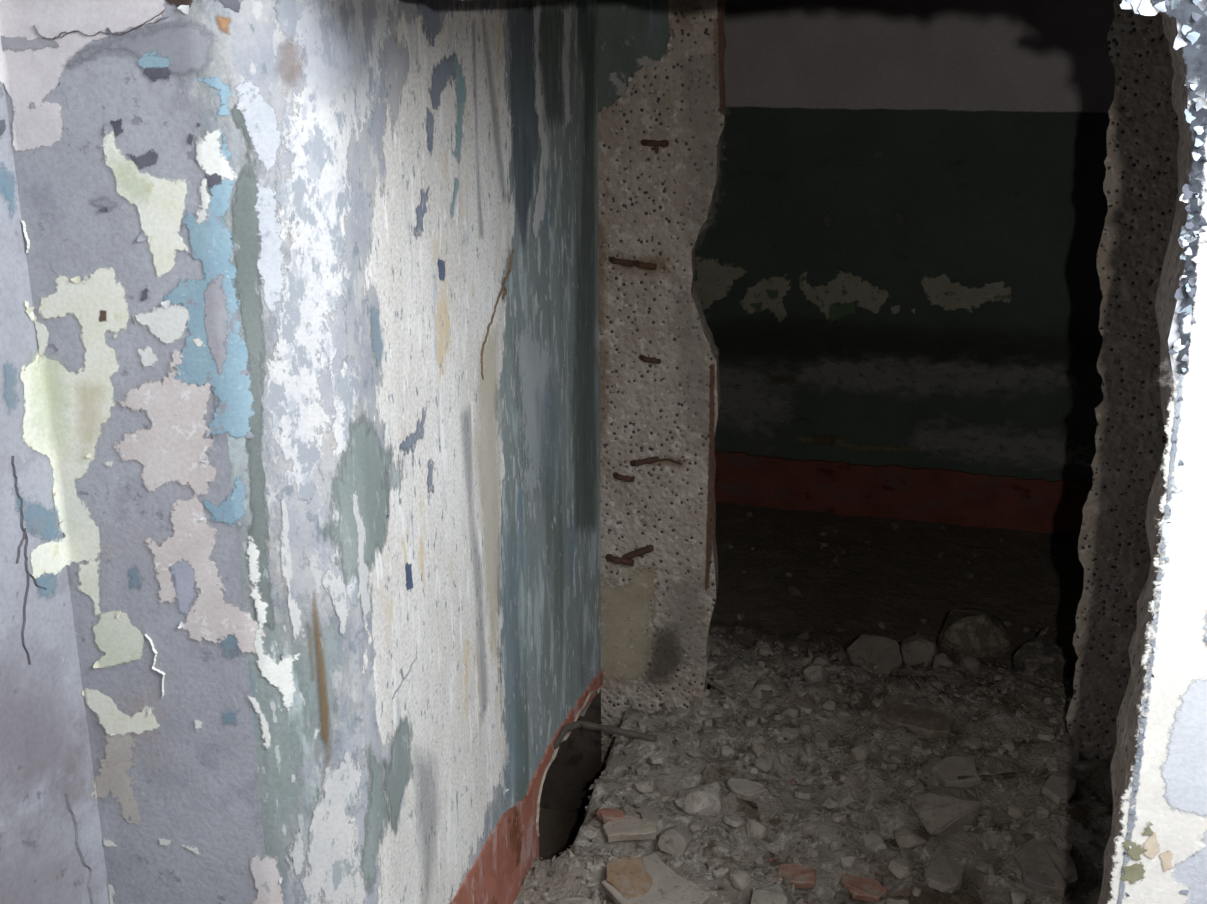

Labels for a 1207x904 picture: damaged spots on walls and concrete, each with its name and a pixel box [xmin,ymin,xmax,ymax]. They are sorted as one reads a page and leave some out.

peeling [597,0,674,113]
spalling [641,139,669,154]
crack [480,250,514,380]
spalling [609,257,657,270]
spalling [639,355,661,364]
peeling [694,256,915,323]
peeling [0,0,515,904]
spalling [613,456,682,482]
peeling [1108,0,1207,904]
crack [11,456,47,665]
spalling [605,545,654,567]
corrosion [314,606,327,741]